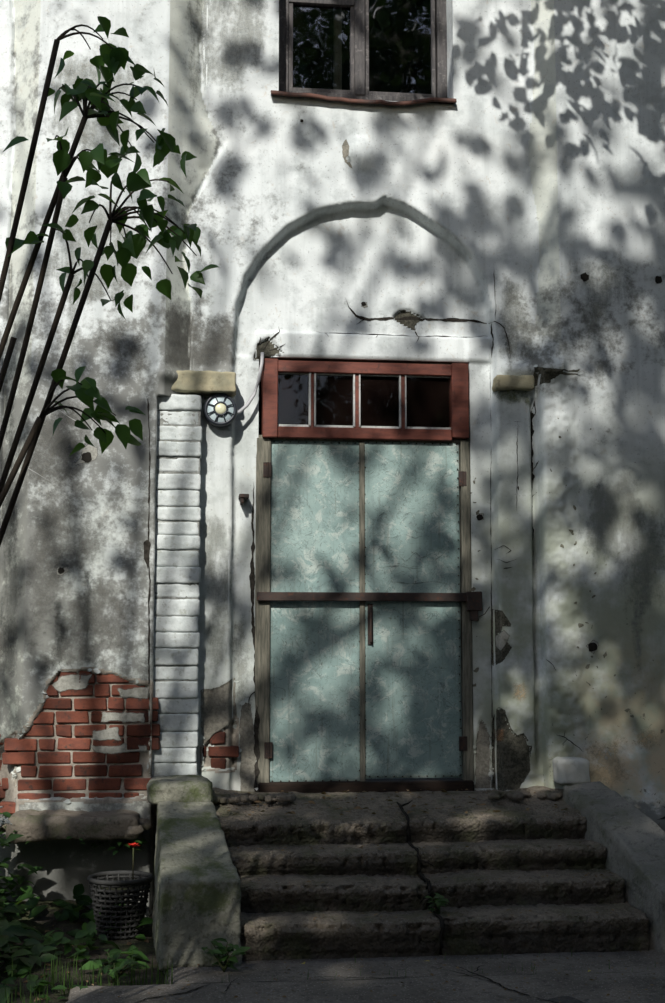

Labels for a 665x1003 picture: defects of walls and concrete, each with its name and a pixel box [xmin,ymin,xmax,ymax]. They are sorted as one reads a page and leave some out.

leakage [98,328,146,370]
crack [316,276,511,416]
leakage [0,489,17,674]
leakage [29,405,128,665]
flaking render [0,667,160,818]
spalling [199,678,258,792]
spalling [473,707,533,791]
crack [397,800,445,948]